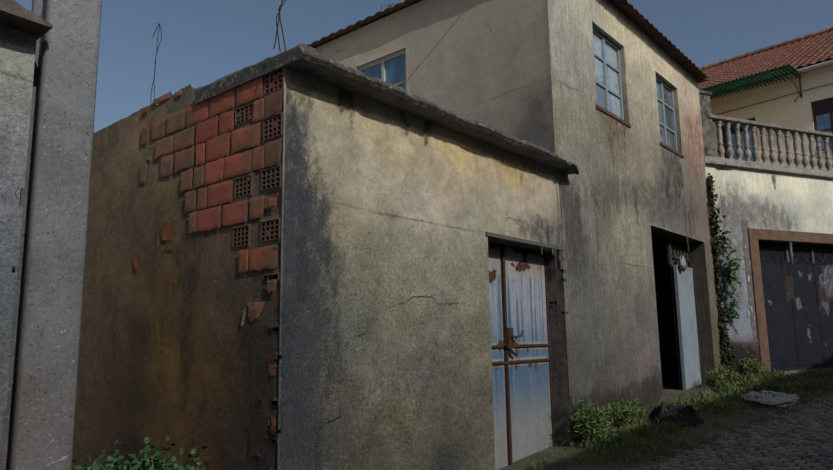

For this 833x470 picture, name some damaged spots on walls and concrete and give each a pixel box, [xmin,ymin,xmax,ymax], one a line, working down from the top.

flaking render [141,23,182,115]
flaking render [139,77,283,234]
flaking render [238,244,278,326]
leakage [241,86,341,470]
rust [490,243,544,272]
rust [493,340,548,371]